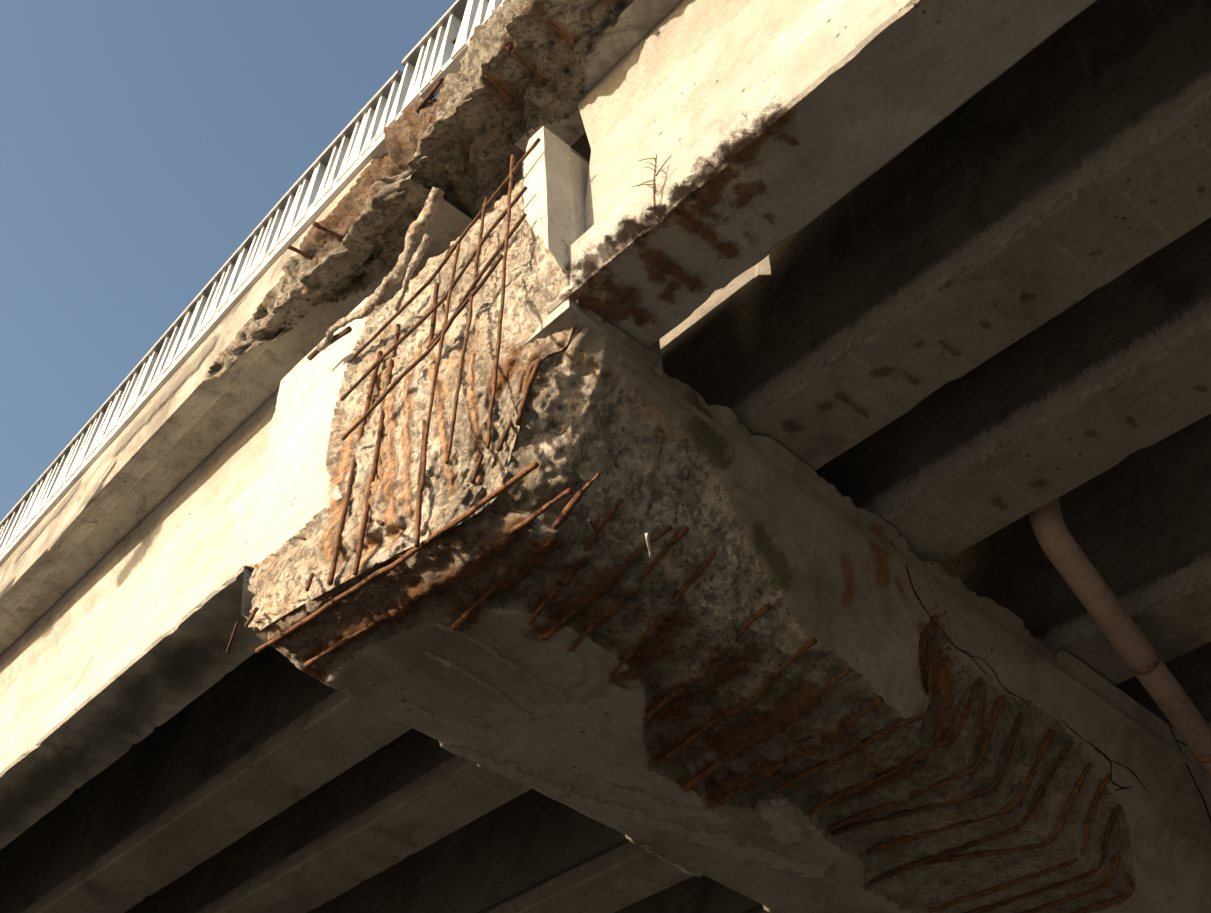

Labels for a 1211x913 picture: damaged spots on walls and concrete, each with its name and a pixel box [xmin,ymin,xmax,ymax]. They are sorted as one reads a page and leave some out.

corrosion [559,103,799,327]
corrosion [322,345,451,578]
corrosion [467,355,482,483]
corrosion [491,353,538,396]
spalling [208,0,1136,913]
corrosion [305,517,566,692]
crack [889,540,1027,703]
crack [1057,716,1152,796]